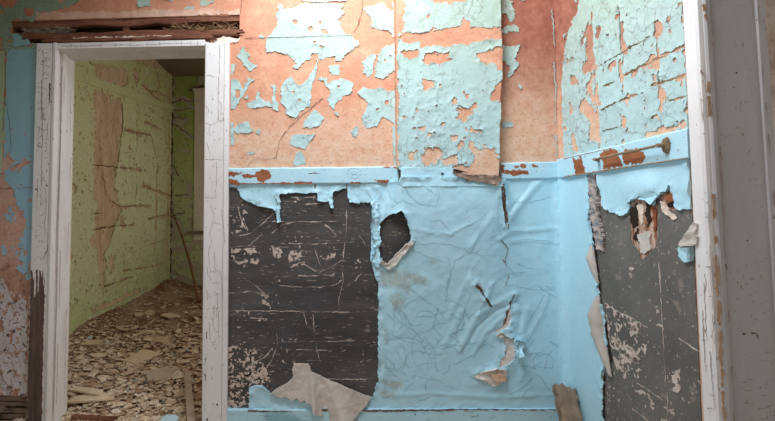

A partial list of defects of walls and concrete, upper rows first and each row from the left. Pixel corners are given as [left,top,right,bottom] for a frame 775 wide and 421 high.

peeling [214,0,538,176]
peeling [561,0,689,174]
crack [602,46,719,134]
peeling [0,0,240,421]
peeling [231,248,260,267]
peeling [288,236,307,266]
crack [350,185,560,412]
spalling [629,189,677,259]
crack [702,126,775,421]
peeling [228,342,274,408]
crack [248,407,287,415]
peeling [606,304,675,421]